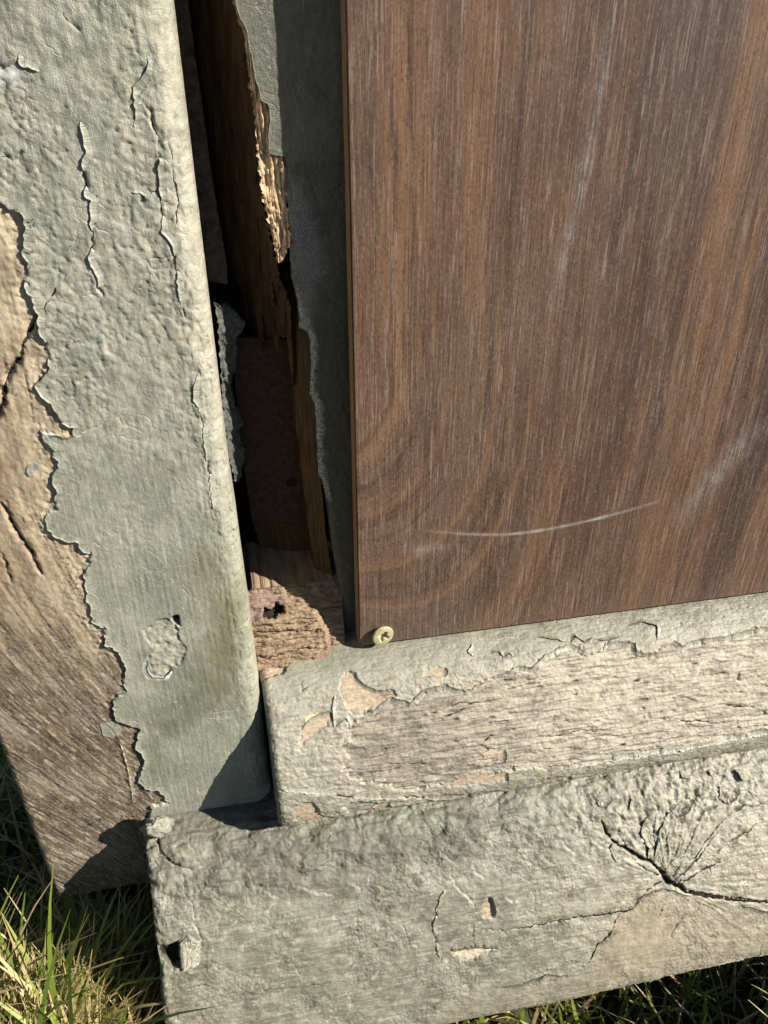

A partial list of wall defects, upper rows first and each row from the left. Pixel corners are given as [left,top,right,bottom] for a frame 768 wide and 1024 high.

crack [78,117,105,295]
crack [132,55,186,315]
peeling [0,204,185,896]
peeling [180,936,200,972]
peeling [259,667,286,683]
peeling [294,801,330,821]
peeling [300,710,333,744]
crack [433,890,446,960]
peeling [338,626,768,797]
crack [472,768,768,946]